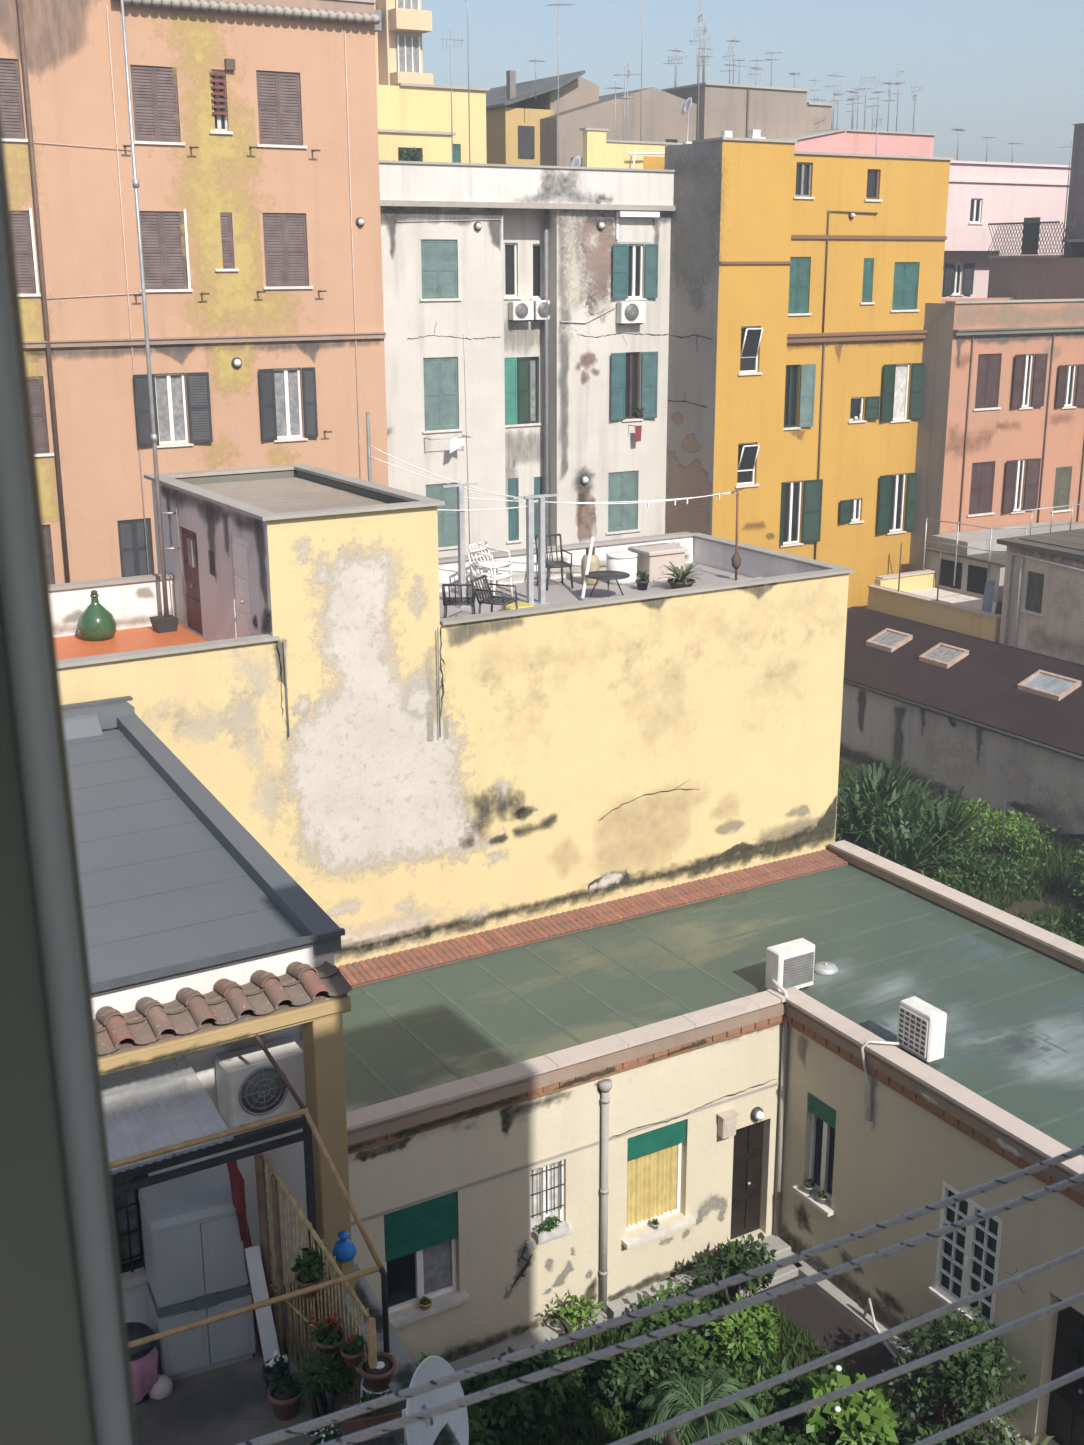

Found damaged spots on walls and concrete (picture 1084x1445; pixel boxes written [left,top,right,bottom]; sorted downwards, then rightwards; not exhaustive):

damp [541,175,671,505]
crack [276,648,288,717]
peeling [280,539,503,875]
crack [437,628,445,715]
damp [858,691,866,731]
crack [599,781,700,821]
damp [839,707,1084,850]
damp [334,792,837,958]
flaking render [504,1245,592,1299]